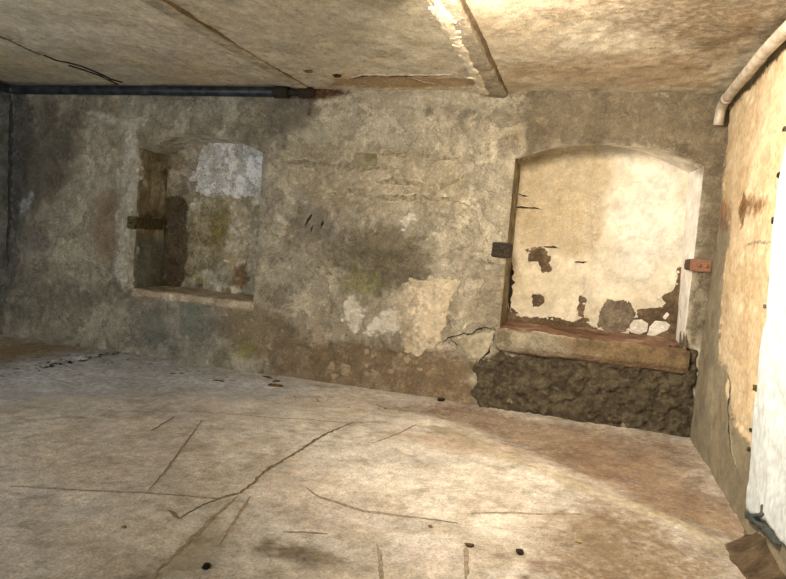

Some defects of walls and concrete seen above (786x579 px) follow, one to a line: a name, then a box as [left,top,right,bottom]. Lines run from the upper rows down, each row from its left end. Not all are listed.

crack [0,33,45,55]
corrosion [296,89,350,115]
corrosion [720,193,765,228]
water stain [342,227,421,295]
peeling [525,246,552,273]
crack [442,262,518,368]
spalling [268,267,698,437]
crack [727,374,736,466]
crack [10,410,417,579]